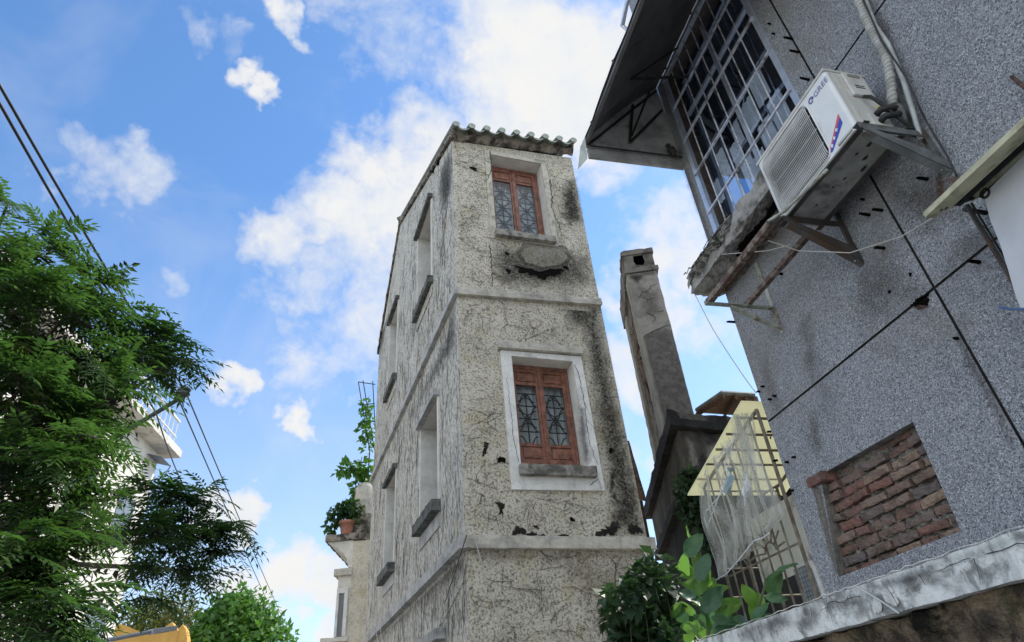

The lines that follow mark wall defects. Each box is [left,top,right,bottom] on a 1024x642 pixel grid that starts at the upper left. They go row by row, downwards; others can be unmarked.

leakage [441,161,450,203]
leakage [564,182,580,221]
spalling [686,214,733,288]
spalling [736,201,778,257]
leakage [570,310,638,530]